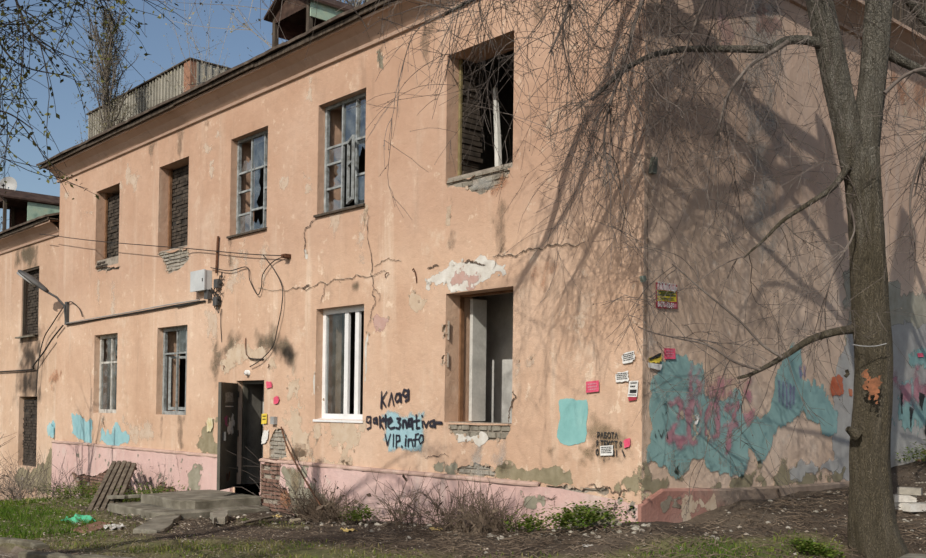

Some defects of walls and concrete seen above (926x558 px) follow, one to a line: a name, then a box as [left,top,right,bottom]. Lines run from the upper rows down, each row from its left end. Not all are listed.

spalling [447,163,513,194]
spalling [158,245,189,273]
crack [259,211,401,326]
peeling [408,254,506,313]
crack [464,241,585,269]
water stain [259,337,293,362]
spalling [259,375,367,515]
spalling [448,421,512,447]
peeling [433,460,637,530]
peeling [660,494,717,521]